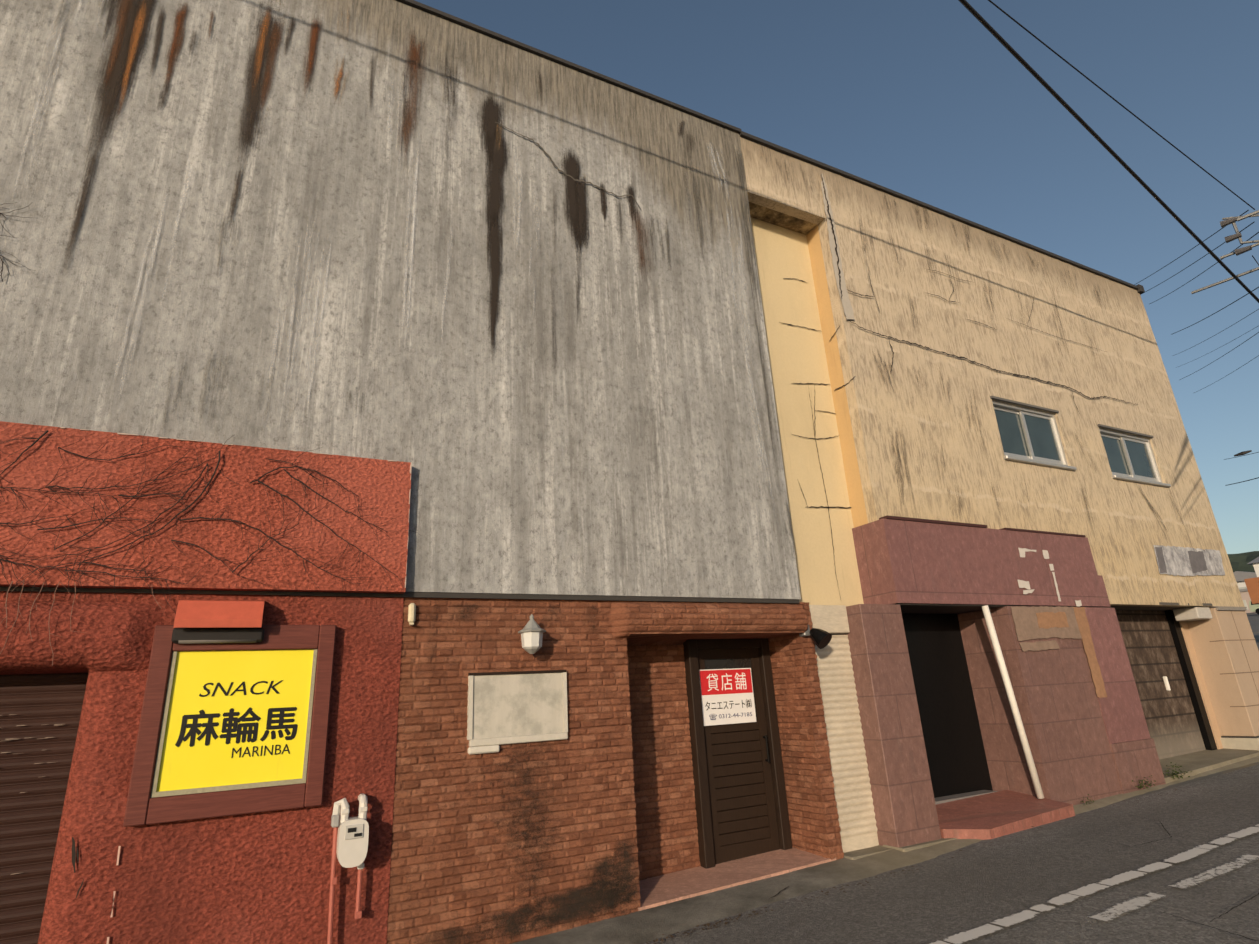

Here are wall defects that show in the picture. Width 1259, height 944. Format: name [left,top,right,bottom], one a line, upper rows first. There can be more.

rust [66,0,213,261]
rust [230,170,241,220]
rust [239,6,294,151]
rust [305,21,321,88]
damp [480,96,507,348]
crack [496,122,642,210]
damp [554,151,669,266]
crack [780,175,1138,414]
crack [791,377,854,598]
peeling [1011,548,1107,698]
damp [491,843,636,936]